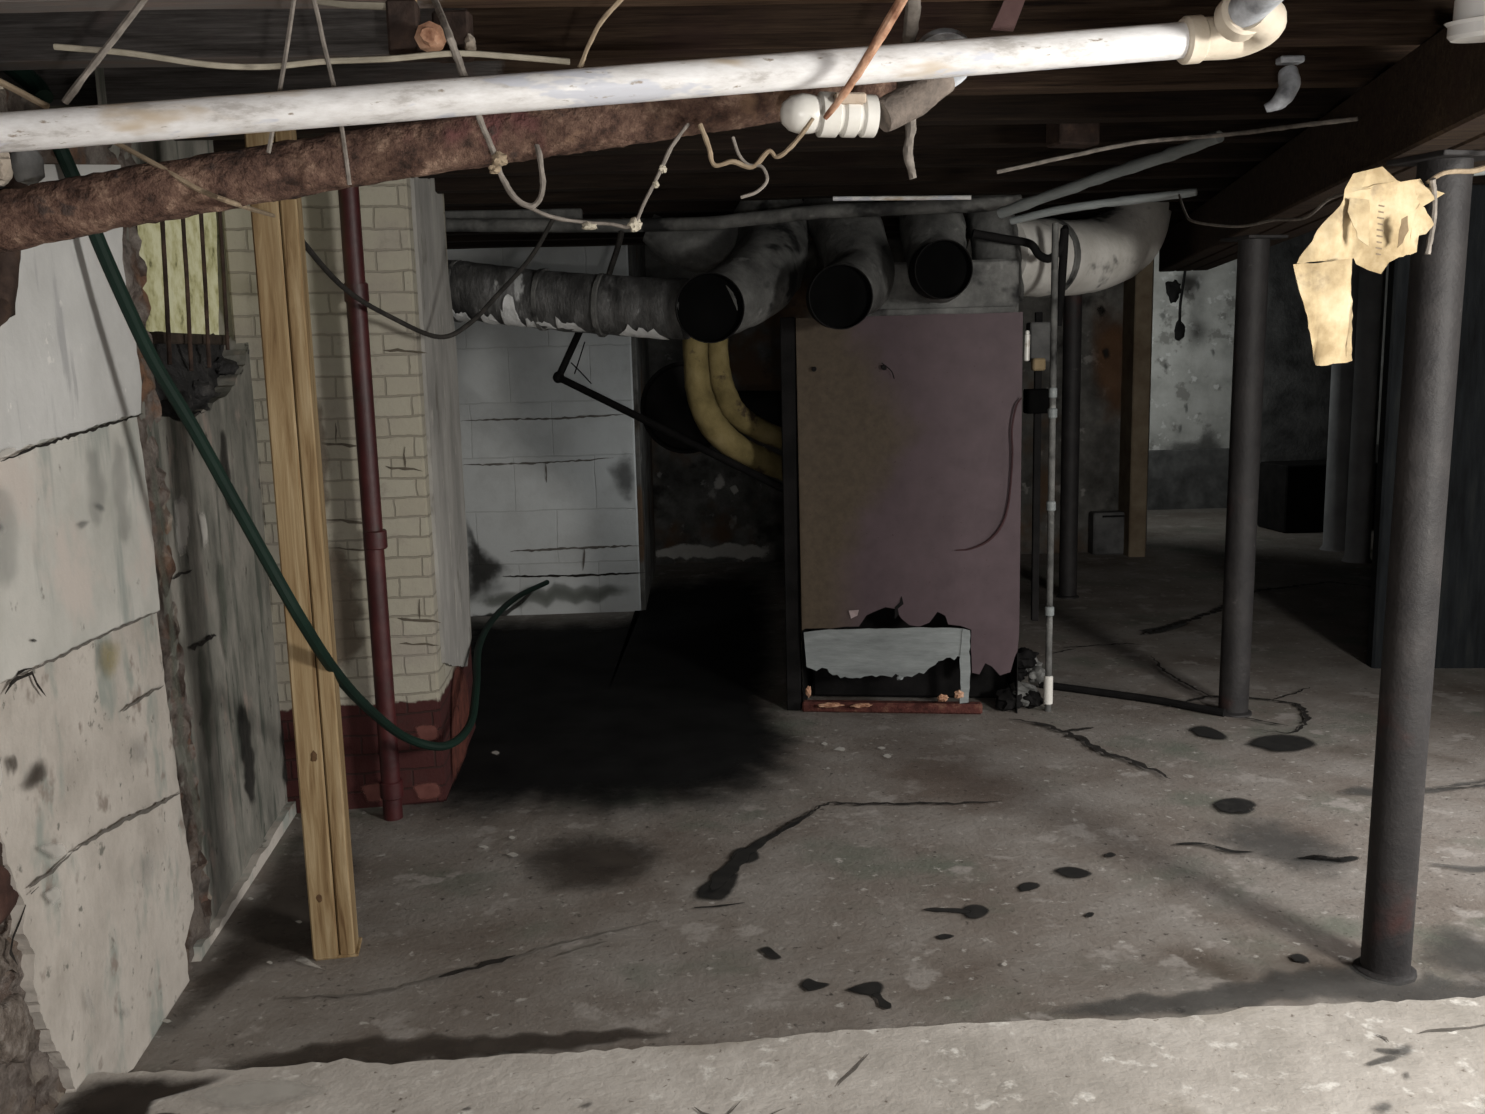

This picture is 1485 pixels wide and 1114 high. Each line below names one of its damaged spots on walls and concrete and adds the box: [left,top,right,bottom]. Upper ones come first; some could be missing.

crack [2,414,141,461]
crack [5,611,160,696]
crack [189,634,216,651]
crack [1054,581,1371,733]
flaking render [10,756,46,788]
crack [1013,719,1170,779]
crack [766,801,998,840]
crack [9,791,182,965]
leakage [533,838,653,887]
spalling [0,842,36,1064]